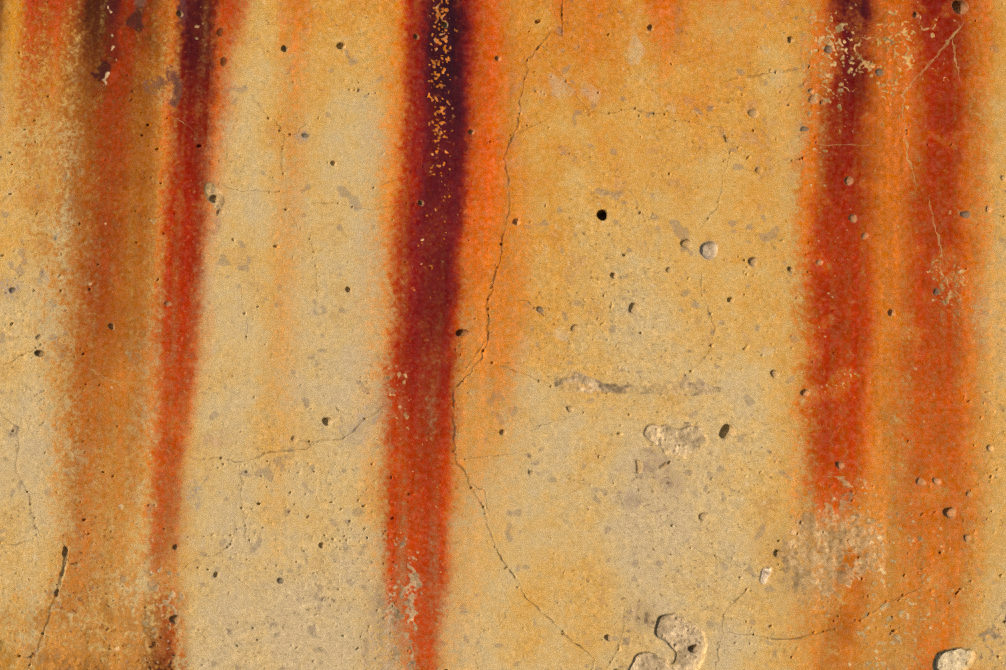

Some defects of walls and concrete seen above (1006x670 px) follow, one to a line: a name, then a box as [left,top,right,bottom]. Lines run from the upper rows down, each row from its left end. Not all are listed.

rust [0,0,257,670]
crack [219,94,319,295]
crack [183,405,385,593]
rust [253,0,320,572]
rust [345,0,614,670]
crack [312,0,877,670]
spalling [603,606,709,670]
spalling [634,423,710,522]
rust [637,0,1006,670]
peeling [758,475,1006,670]